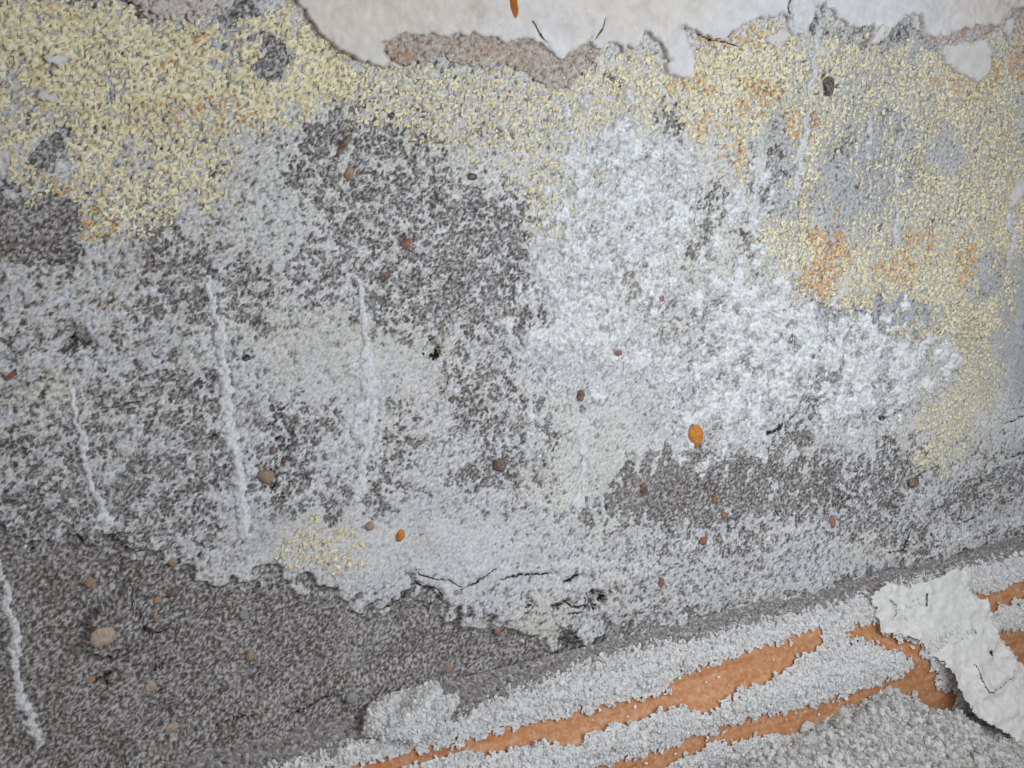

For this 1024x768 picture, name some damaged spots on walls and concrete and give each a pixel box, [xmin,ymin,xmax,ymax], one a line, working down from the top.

corrosion [510,0,518,18]
spalling [0,126,93,280]
spalling [0,322,99,365]
leakage [70,387,144,526]
efflorescence [204,275,256,542]
spalling [123,99,559,495]
leakage [0,0,1024,513]
spalling [652,96,685,138]
spalling [682,180,761,265]
spalling [747,145,787,218]
spalling [0,362,1024,768]
efflorescence [0,559,44,749]